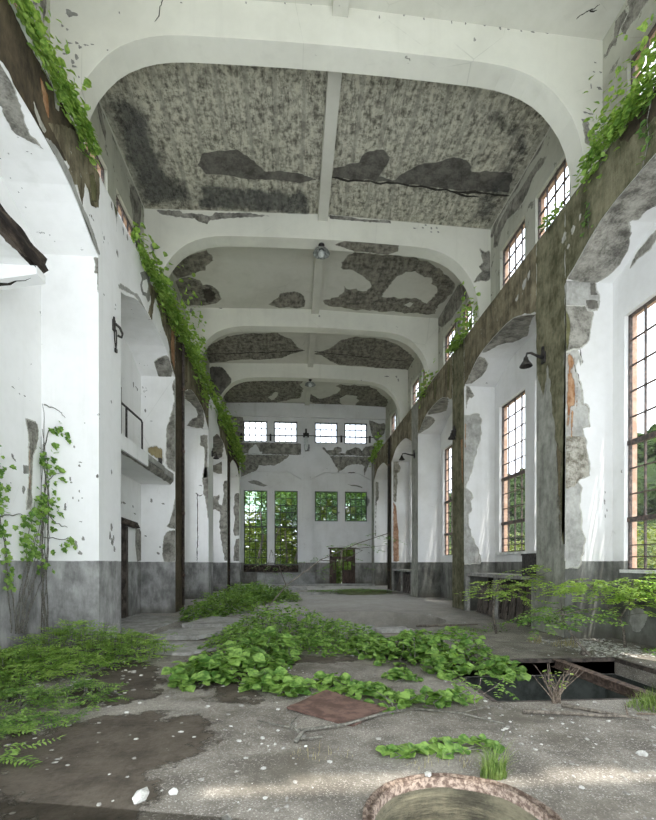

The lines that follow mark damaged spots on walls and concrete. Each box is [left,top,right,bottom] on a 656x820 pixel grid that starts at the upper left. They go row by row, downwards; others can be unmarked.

peeling [0,64,105,296]
peeling [97,63,327,248]
crack [332,177,509,197]
peeling [328,73,550,283]
crack [0,278,30,286]
peeling [172,250,222,314]
peeling [269,291,306,308]
peeling [323,241,469,328]
spalling [11,418,39,510]
spalling [464,314,536,565]
rust [567,354,577,437]
peeling [565,154,656,569]